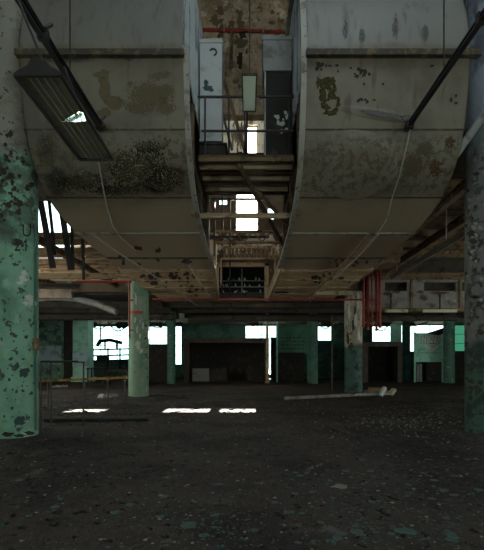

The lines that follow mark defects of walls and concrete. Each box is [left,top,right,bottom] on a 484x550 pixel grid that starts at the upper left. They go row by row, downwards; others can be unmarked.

peeling [209,1,259,69]
peeling [315,62,340,116]
peeling [0,129,34,216]
peeling [140,269,204,297]
peeling [346,292,360,349]
peeling [7,347,33,378]